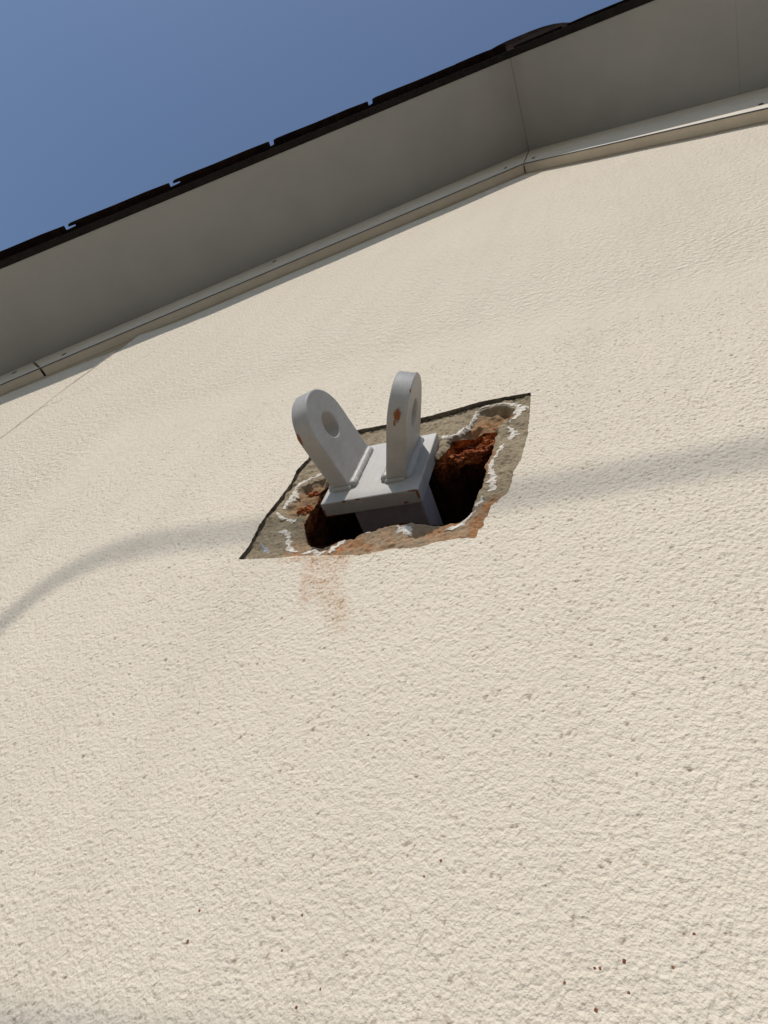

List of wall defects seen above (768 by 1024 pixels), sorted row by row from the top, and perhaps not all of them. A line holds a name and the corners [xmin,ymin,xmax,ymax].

hole [239,393,531,559]